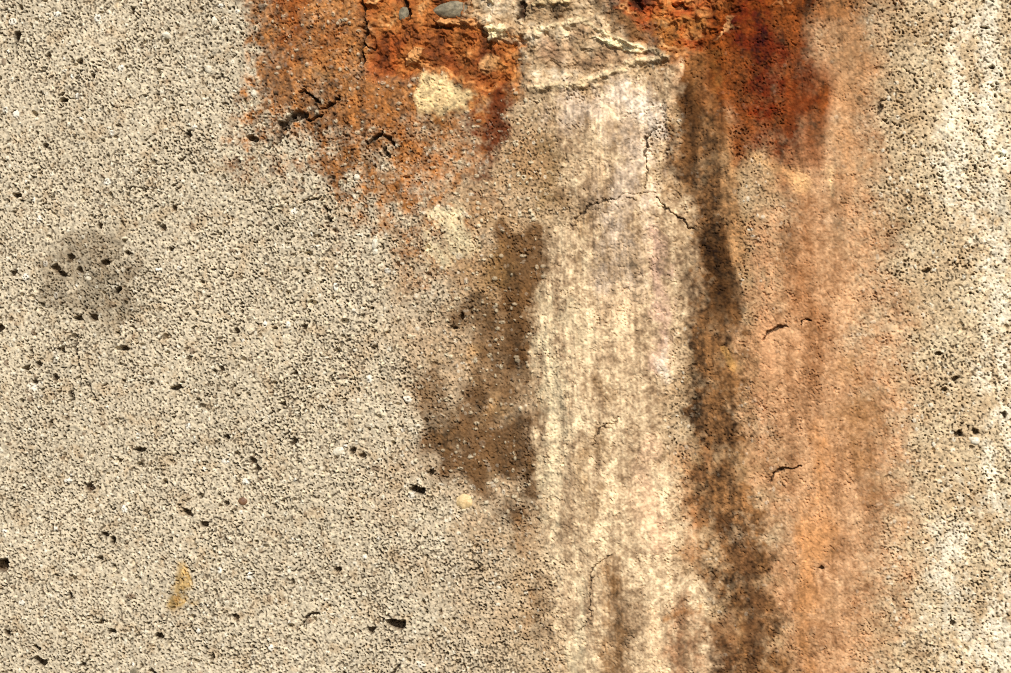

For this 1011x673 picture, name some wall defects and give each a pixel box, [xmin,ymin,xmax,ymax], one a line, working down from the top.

crack [276,89,341,145]
rust [216,0,529,309]
peeling [353,0,702,122]
crack [575,128,694,229]
spalling [712,15,741,41]
water stain [404,61,802,673]